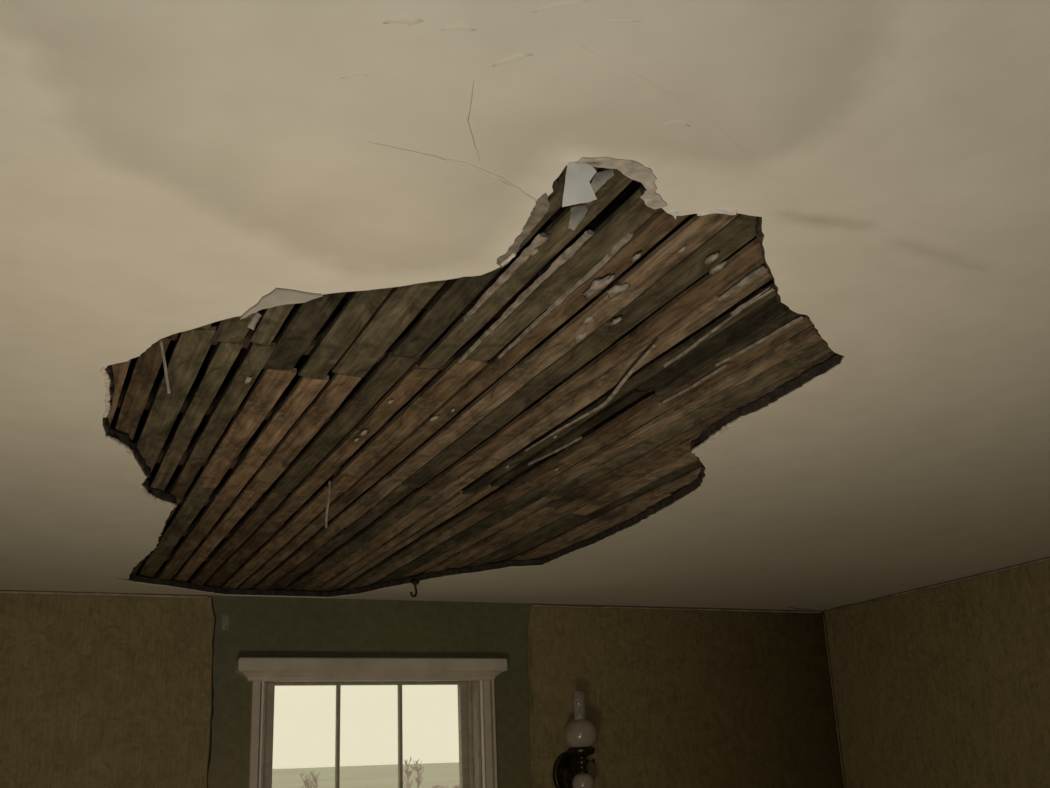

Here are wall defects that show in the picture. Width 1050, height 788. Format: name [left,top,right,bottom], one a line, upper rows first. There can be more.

crack [369,79,538,201]
spalling [458,157,677,363]
spalling [100,216,844,597]